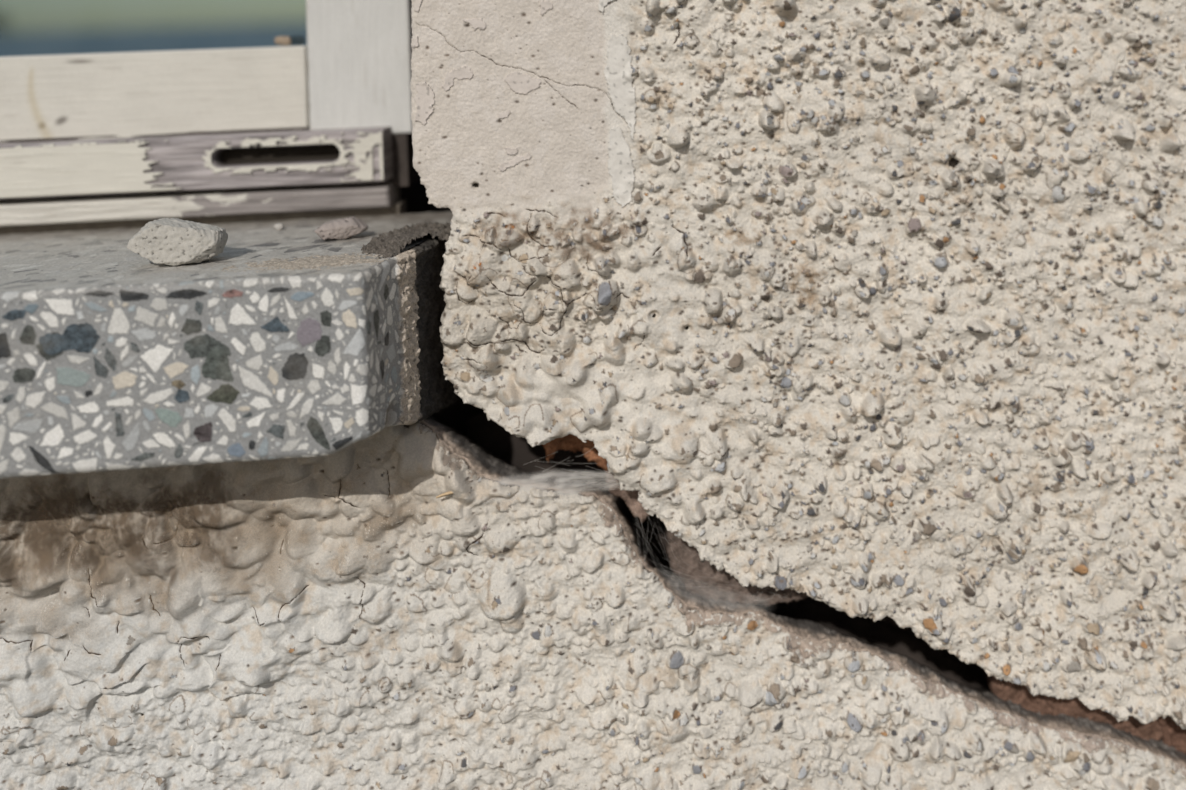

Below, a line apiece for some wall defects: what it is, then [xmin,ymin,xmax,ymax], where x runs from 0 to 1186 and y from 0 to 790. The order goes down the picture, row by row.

crack [419,25,623,119]
crack [456,209,629,364]
leakage [0,481,226,578]
crack [404,399,1186,769]